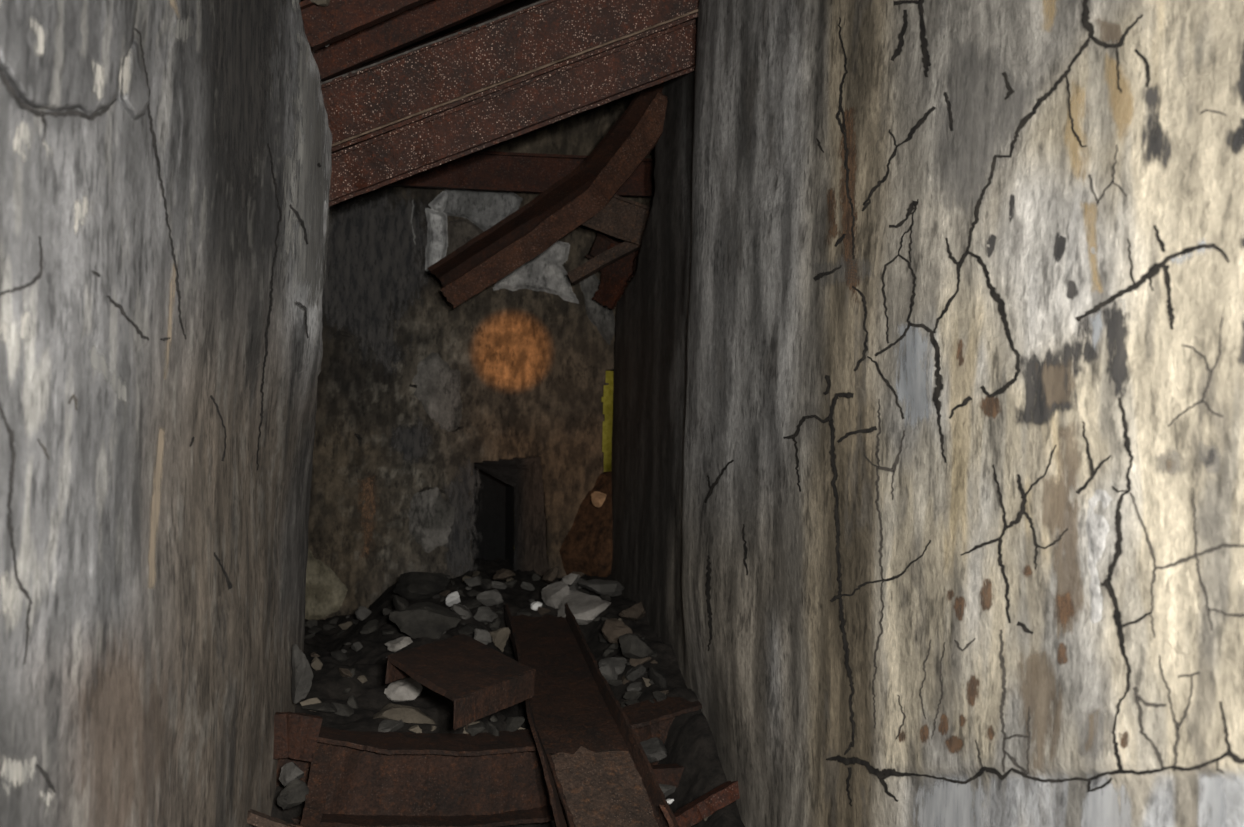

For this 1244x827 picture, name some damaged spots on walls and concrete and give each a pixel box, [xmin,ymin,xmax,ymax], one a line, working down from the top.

crack [0,68,117,140]
crack [92,27,187,341]
crack [0,236,43,296]
crack [68,394,78,410]
crack [783,0,1244,806]
crack [0,405,49,665]
rust [947,590,966,621]
rust [979,579,994,610]
rust [1057,643,1068,664]
rust [898,675,979,753]